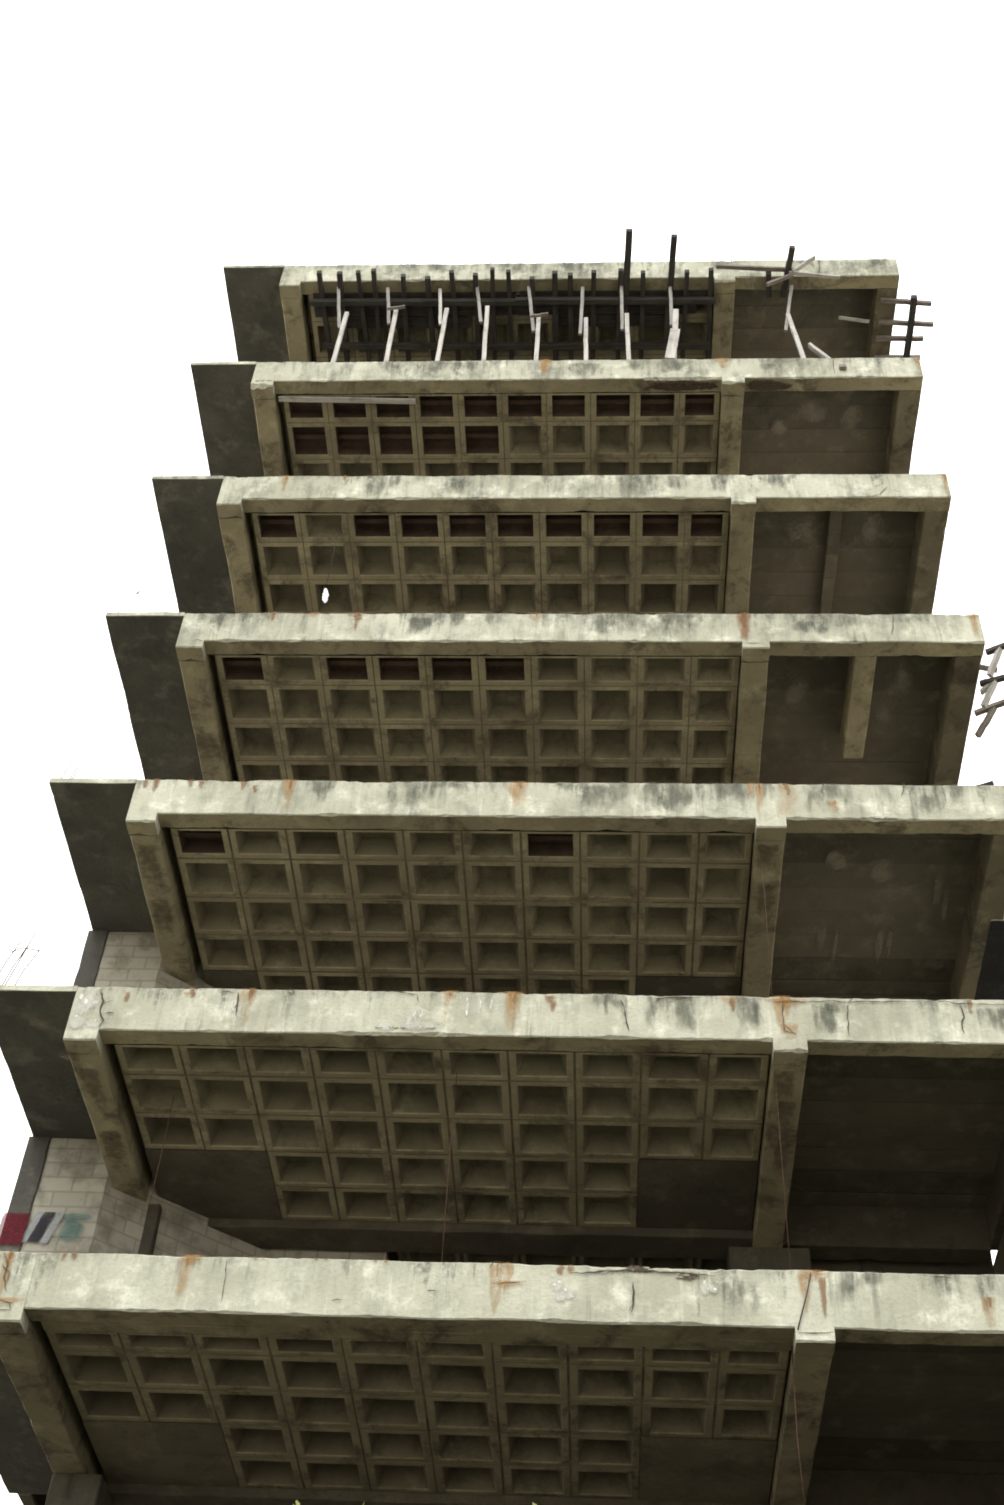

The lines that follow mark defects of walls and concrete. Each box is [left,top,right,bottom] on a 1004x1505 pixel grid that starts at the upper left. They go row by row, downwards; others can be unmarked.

rust [739,613,749,638]
damp [822,1004,837,1030]
rust [810,1270,826,1312]